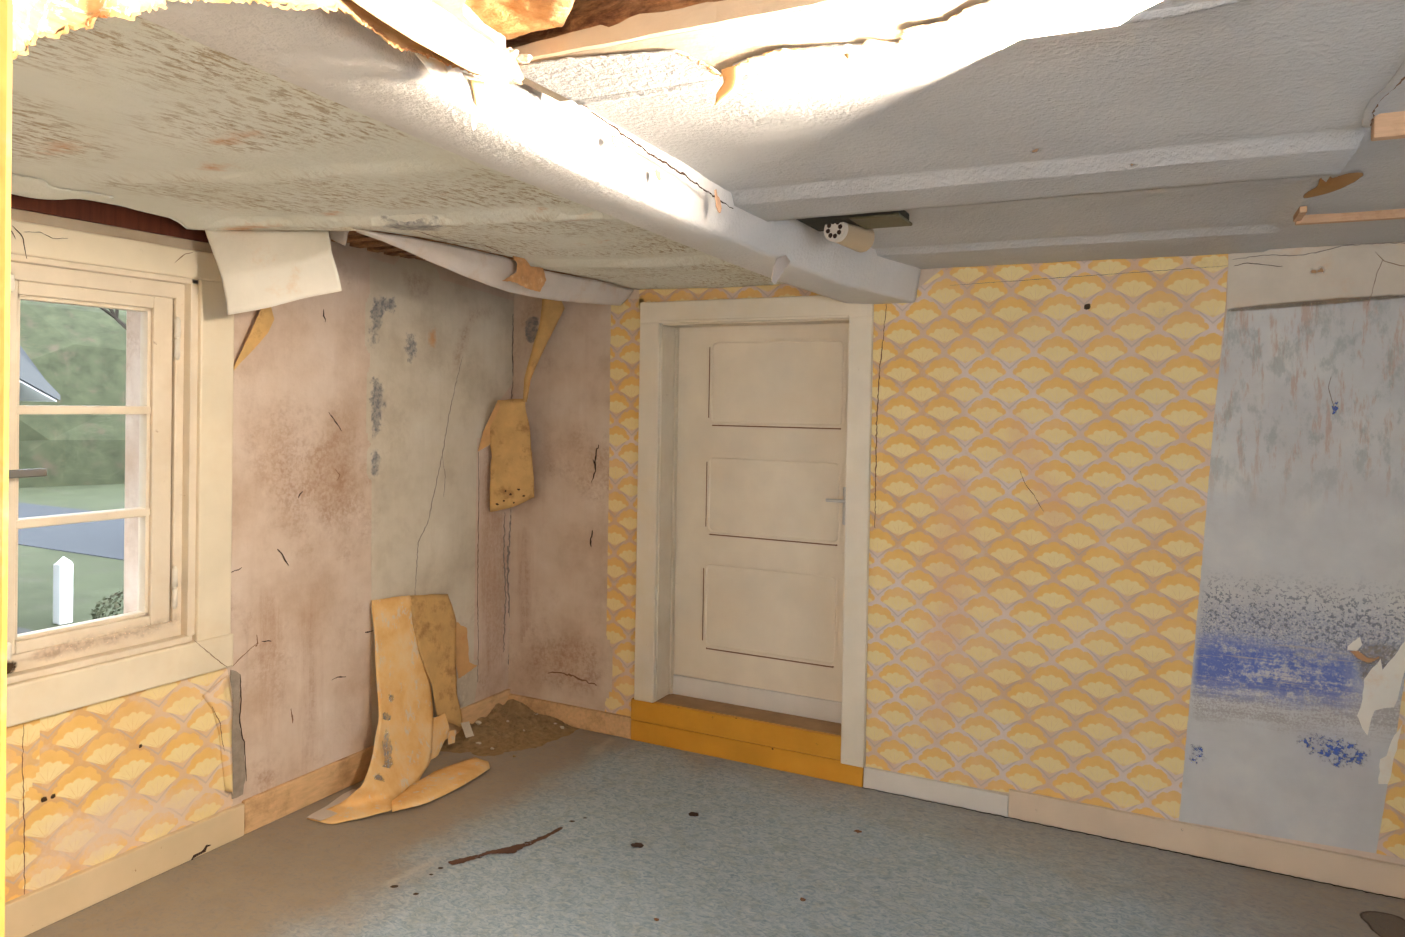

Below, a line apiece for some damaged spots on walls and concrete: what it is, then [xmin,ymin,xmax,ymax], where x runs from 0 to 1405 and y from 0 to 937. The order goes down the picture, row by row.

peeling [1347,637,1405,736]
peeling [1378,725,1402,784]
water stain [1360,911,1405,937]